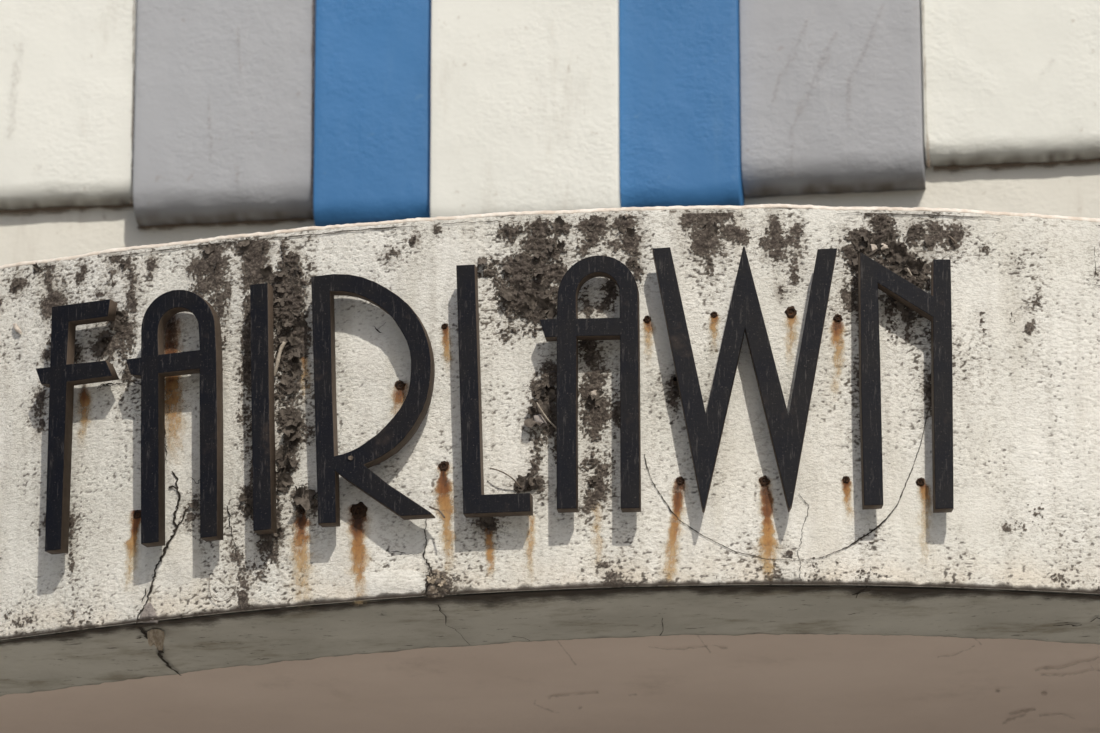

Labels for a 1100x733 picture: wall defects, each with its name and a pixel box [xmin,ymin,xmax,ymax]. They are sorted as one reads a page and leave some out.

damp [0,212,1100,646]
corrosion [126,510,141,571]
crack [136,430,199,675]
corrosion [294,509,310,570]
corrosion [350,502,368,581]
crack [387,521,470,645]
corrosion [436,461,453,554]
corrosion [486,529,494,569]
corrosion [667,476,685,577]
corrosion [759,475,776,572]
crack [644,410,929,579]
corrosion [916,477,931,513]